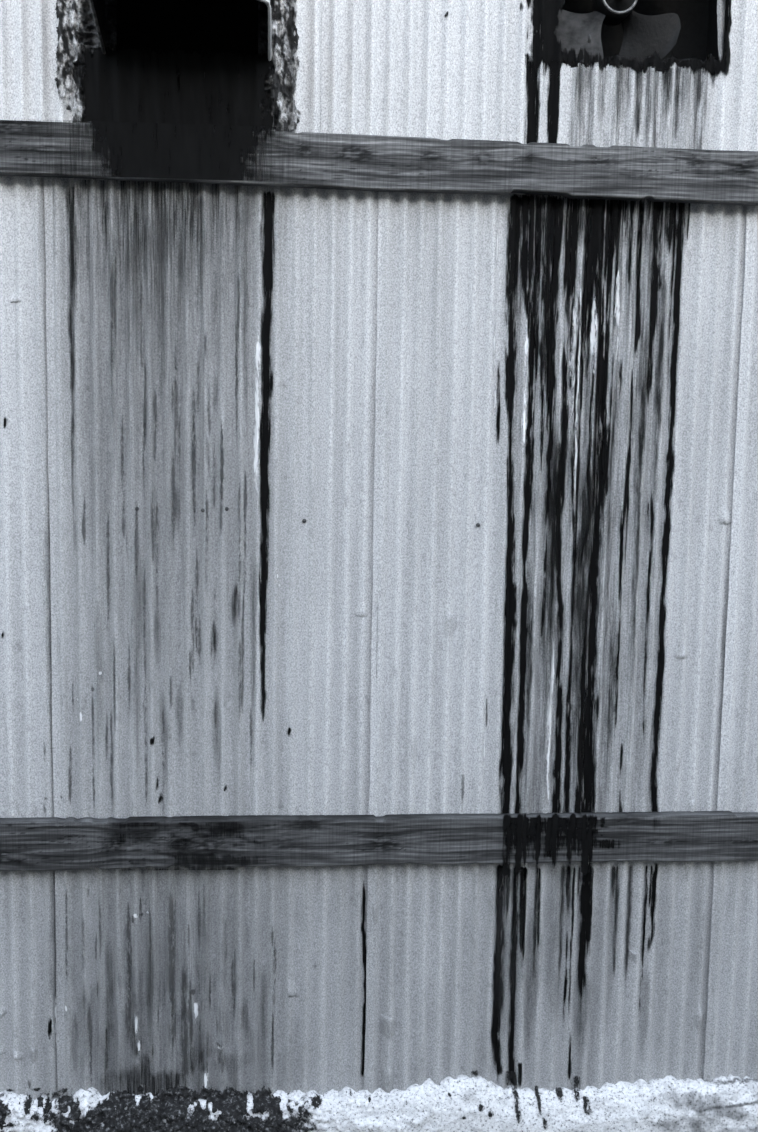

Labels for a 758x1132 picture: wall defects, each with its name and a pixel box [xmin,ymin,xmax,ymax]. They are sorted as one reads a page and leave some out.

damp [525,60,561,144]
damp [663,66,680,127]
damp [697,42,728,103]
damp [66,179,243,403]
damp [141,346,157,458]
damp [172,365,224,539]
damp [232,192,275,754]
damp [107,497,158,612]
damp [189,559,216,676]
damp [491,195,690,1086]
damp [92,648,130,799]
damp [152,822,258,870]